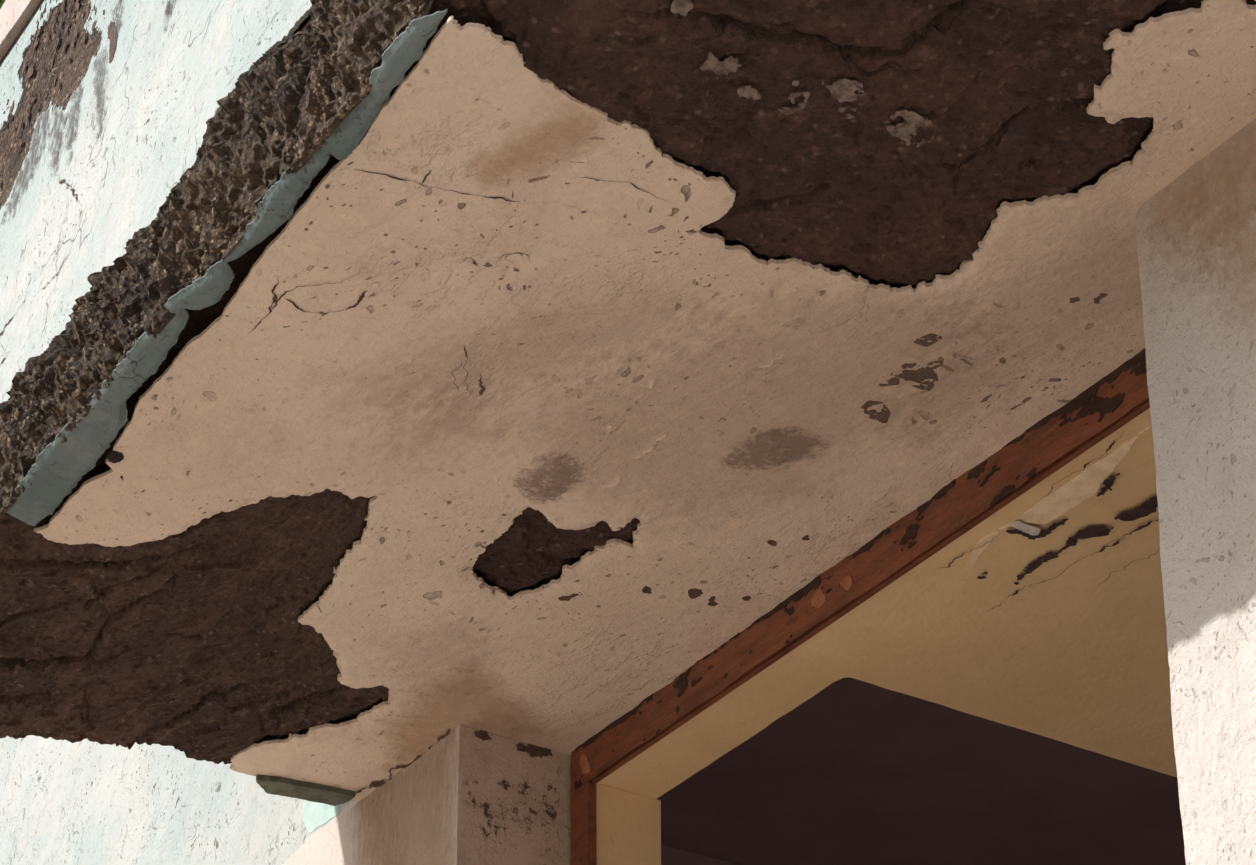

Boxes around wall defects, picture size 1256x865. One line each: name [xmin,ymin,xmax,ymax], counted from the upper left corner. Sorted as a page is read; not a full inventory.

spalling [423,0,1204,289]
peeling [914,333,942,347]
peeling [860,361,942,423]
peeling [1003,348,1147,448]
water stain [727,430,822,469]
spalling [473,507,640,592]
peeling [852,460,1001,559]
peeling [941,426,1159,611]
peeling [673,576,840,714]
peeling [575,693,661,753]